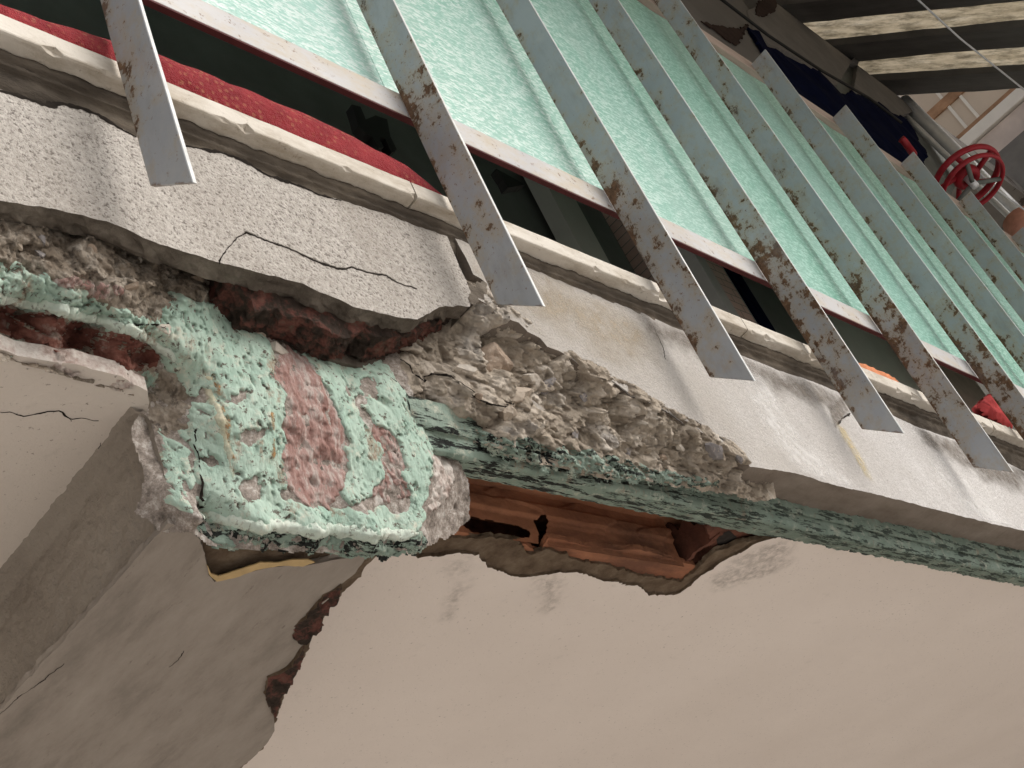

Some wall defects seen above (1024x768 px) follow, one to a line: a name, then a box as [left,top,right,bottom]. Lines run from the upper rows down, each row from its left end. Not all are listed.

rust [927,92,965,120]
rust [957,88,1016,139]
crack [219,231,417,289]
crack [1,410,101,449]
peeling [0,219,776,593]
flaking render [263,583,342,718]